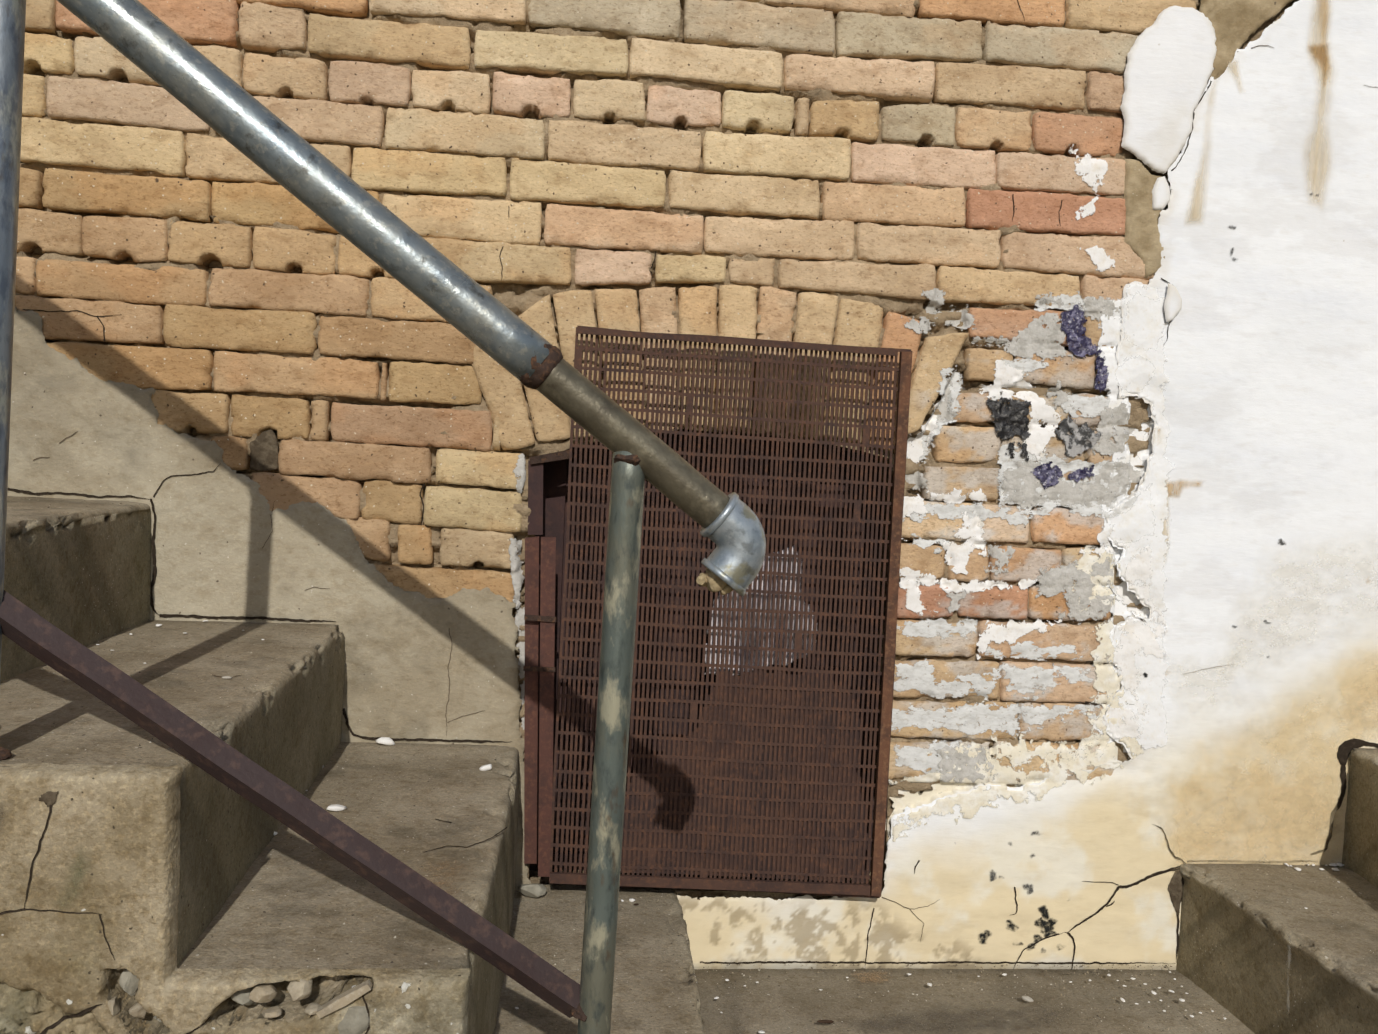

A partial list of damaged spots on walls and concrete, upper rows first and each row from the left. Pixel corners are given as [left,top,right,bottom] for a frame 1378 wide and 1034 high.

peeling [1069,144,1108,220]
damp [1190,179,1201,220]
spalling [249,430,278,471]
crack [8,431,336,622]
peeling [885,159,1182,842]
spalling [39,791,58,807]
crack [0,805,115,960]
crack [700,741,1378,970]
damp [1007,884,1060,950]
spalling [0,969,173,1034]
spalling [208,968,373,1025]
crack [362,977,370,1034]